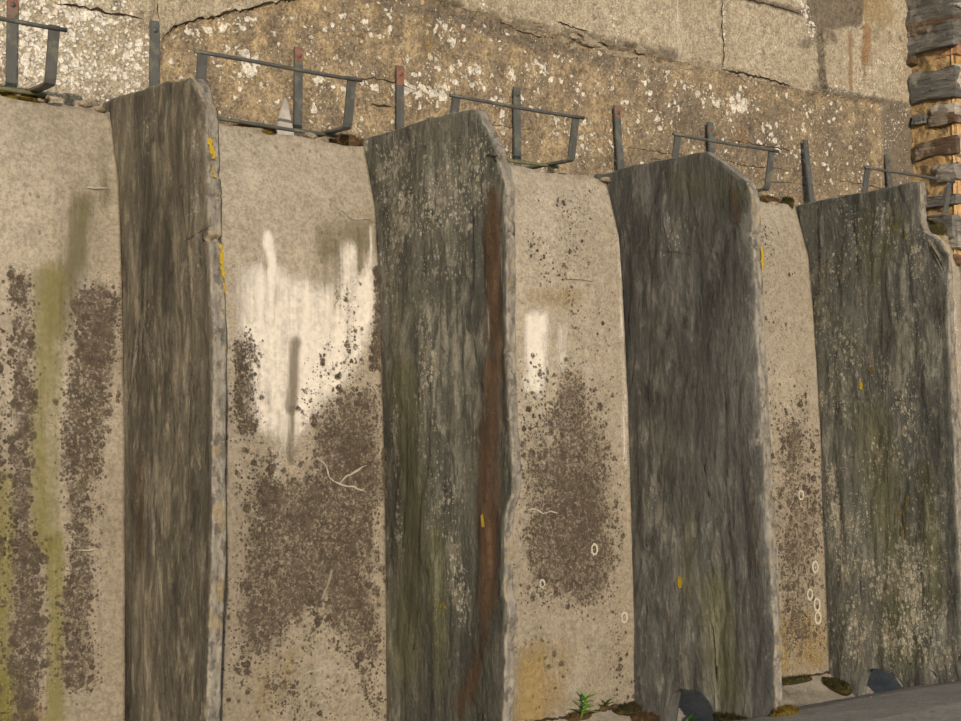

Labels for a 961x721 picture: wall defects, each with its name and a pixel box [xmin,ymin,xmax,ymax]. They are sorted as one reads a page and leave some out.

crack [56,3,159,19]
water stain [0,200,138,721]
water stain [221,227,388,721]
rust [477,191,502,626]
water stain [513,188,635,721]